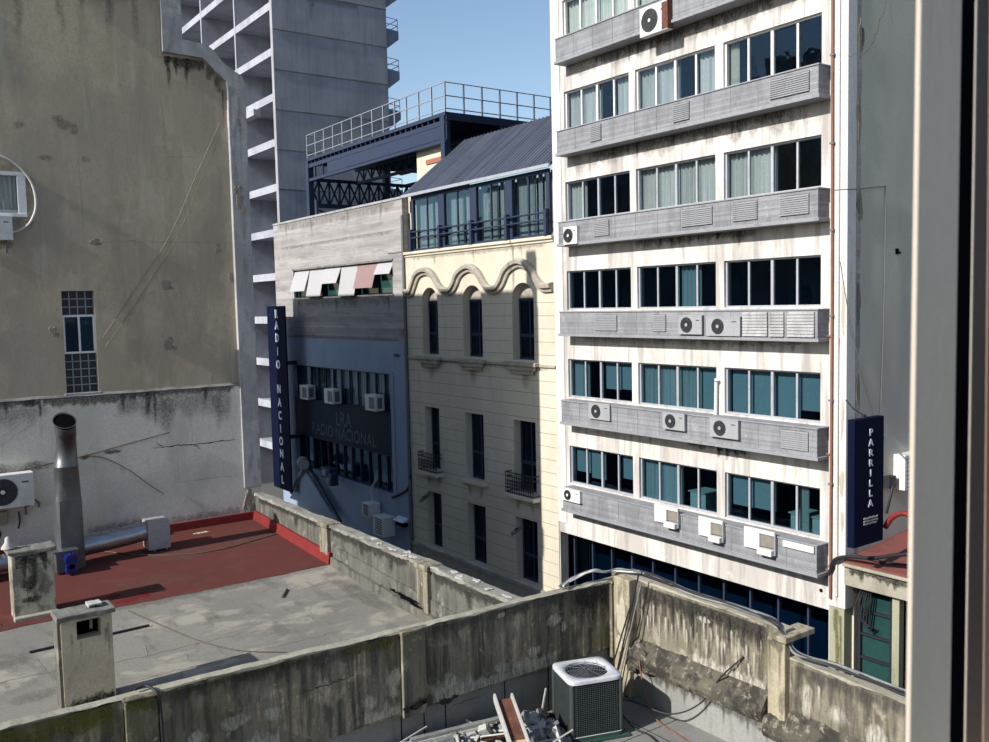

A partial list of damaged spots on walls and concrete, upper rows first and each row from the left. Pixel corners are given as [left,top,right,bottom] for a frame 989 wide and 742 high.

leakage [164,56,223,96]
leakage [0,386,233,415]
crack [157,439,233,449]
leakage [433,573,608,642]
leakage [633,586,782,690]
leakage [365,671,401,724]
leakage [435,647,555,702]
leakage [797,668,905,715]
leakage [867,724,895,742]